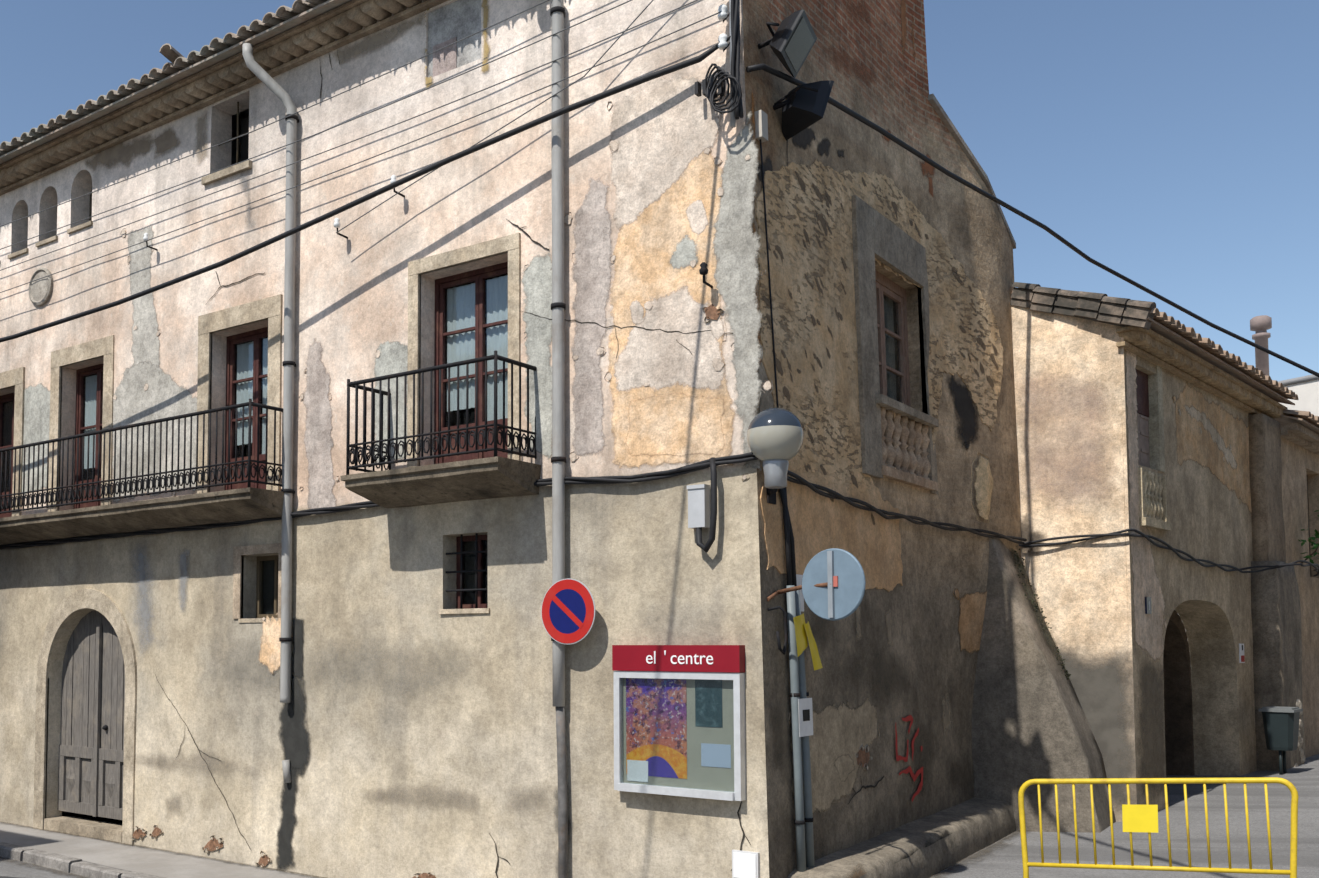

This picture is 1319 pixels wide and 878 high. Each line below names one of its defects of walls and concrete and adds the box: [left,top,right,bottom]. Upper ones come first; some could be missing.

flaking render [522,253,552,458]
crack [522,311,733,358]
flaking render [564,75,1003,592]
water stain [948,375,978,450]
flaking render [953,588,987,653]
crack [156,677,251,850]
flaking render [809,697,880,813]
crack [848,776,884,804]